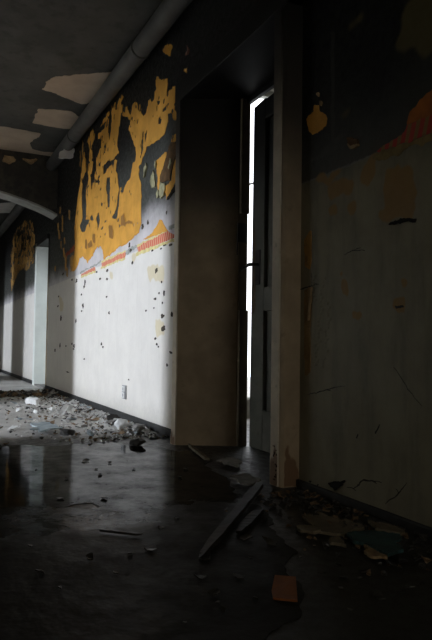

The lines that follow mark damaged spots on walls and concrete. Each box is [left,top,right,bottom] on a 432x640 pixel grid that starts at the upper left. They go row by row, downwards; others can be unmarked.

peeling [0,72,176,312]
peeling [306,92,327,135]